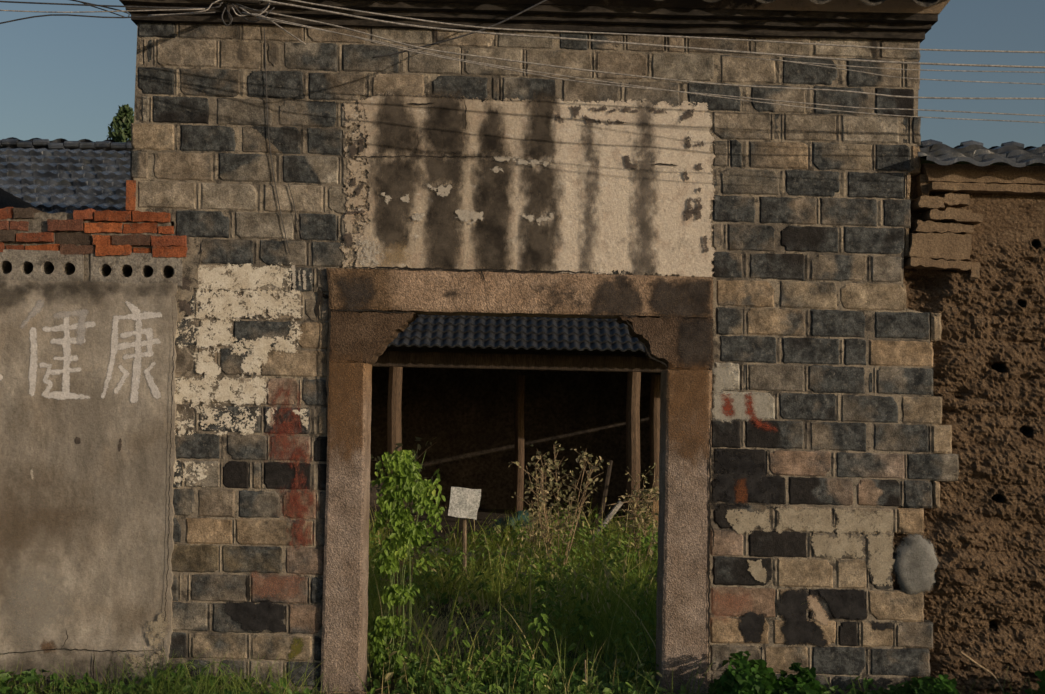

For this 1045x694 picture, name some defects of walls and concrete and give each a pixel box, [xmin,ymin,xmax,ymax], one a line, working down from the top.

spalling [343,233,384,267]
damp [371,91,563,273]
damp [541,103,713,368]
peeling [174,263,312,437]
peeling [174,460,213,487]